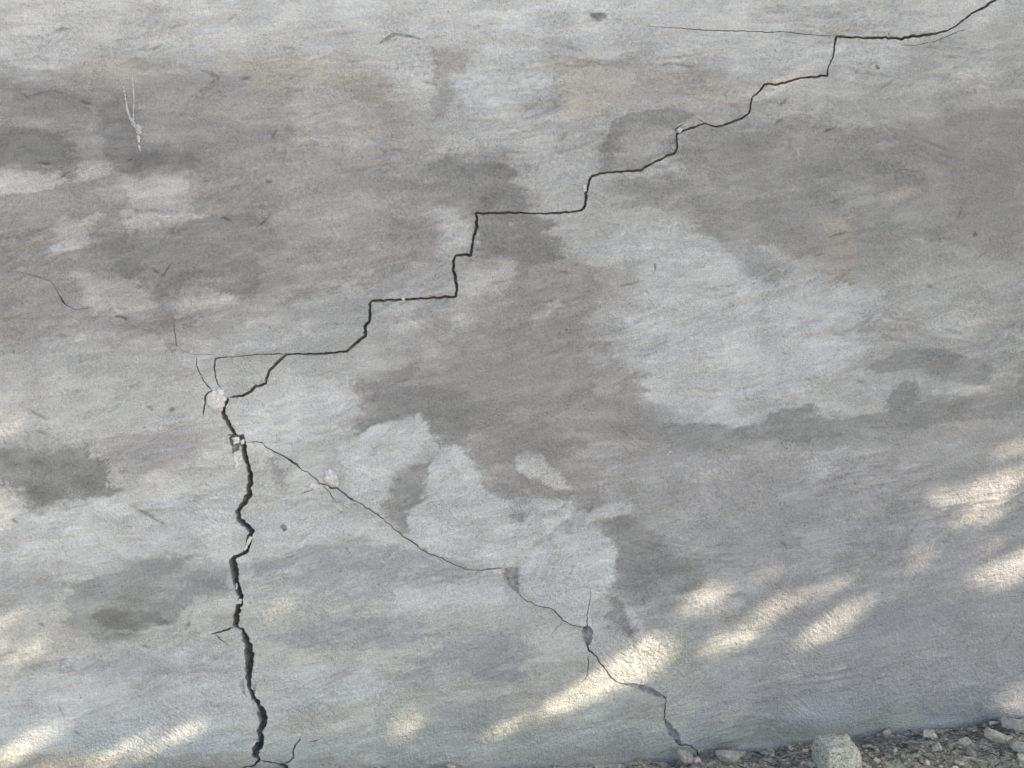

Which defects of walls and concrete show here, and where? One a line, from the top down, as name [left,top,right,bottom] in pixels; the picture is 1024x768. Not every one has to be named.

leakage [0,75,207,180]
leakage [81,202,297,353]
leakage [399,140,573,297]
leakage [574,75,1024,286]
leakage [0,432,126,517]
leakage [339,371,486,538]
crack [196,0,997,768]
leakage [615,341,1024,457]
leakage [602,515,718,654]